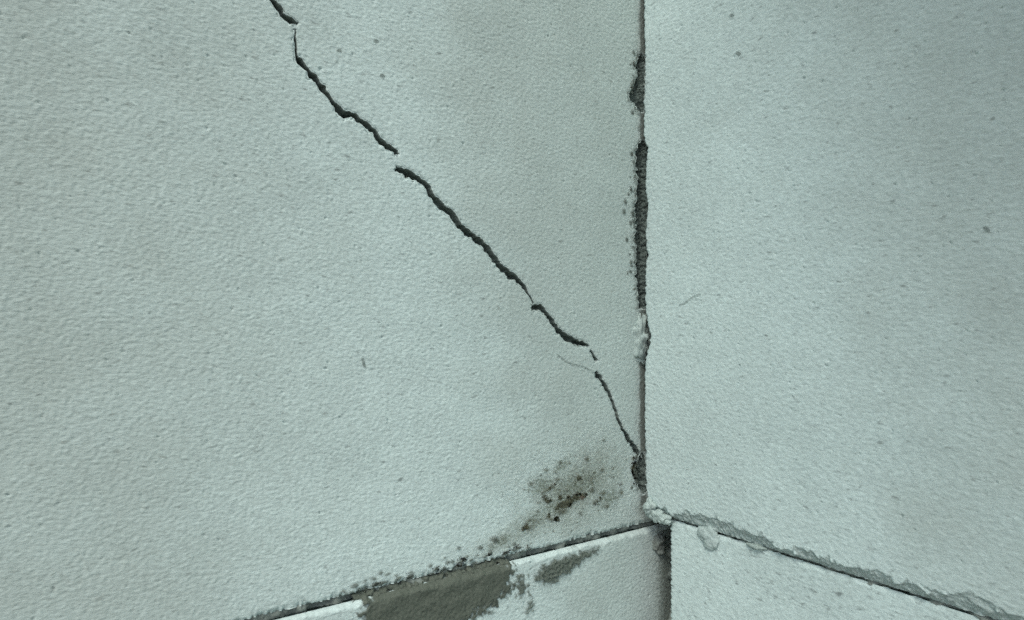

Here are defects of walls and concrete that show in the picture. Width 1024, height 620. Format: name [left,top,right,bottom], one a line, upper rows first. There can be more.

crack [267,0,642,459]
leakage [527,476,623,533]